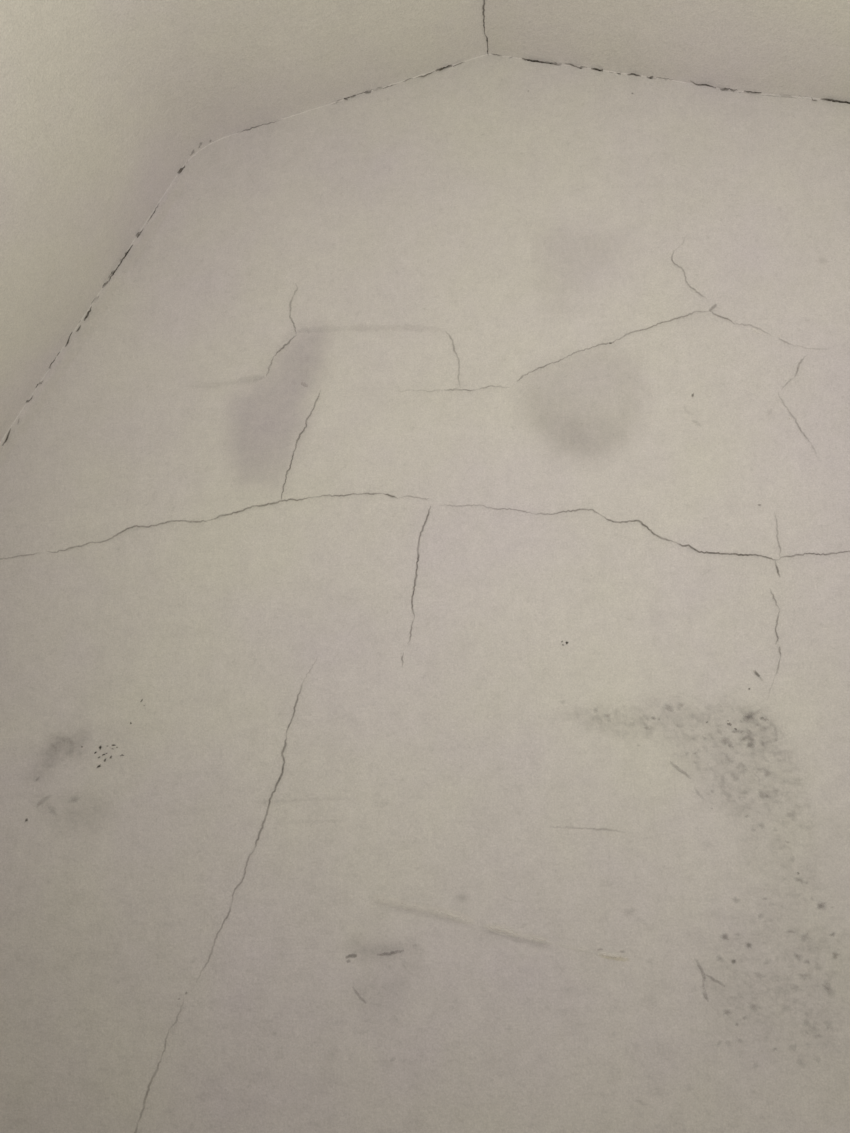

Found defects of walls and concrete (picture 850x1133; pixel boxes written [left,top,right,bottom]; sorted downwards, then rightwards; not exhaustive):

crack [50,207,157,366]
crack [683,545,779,572]